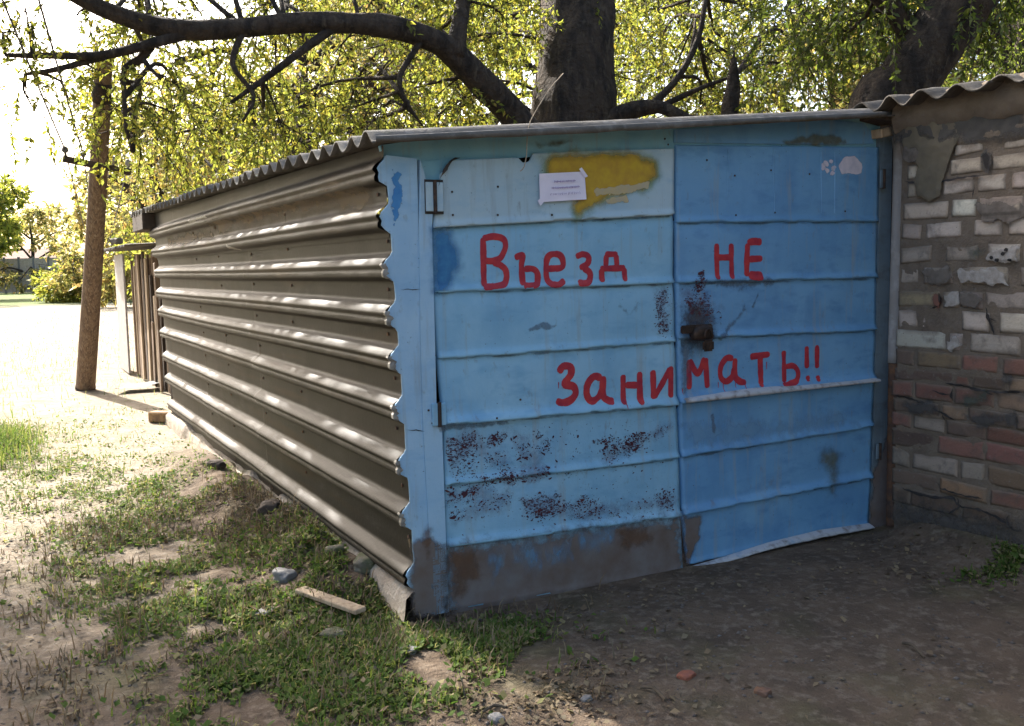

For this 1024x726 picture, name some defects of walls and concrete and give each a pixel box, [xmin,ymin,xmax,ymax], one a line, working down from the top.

spalling [975,201,1024,224]
rust [654,269,722,338]
spalling [944,245,1020,307]
rust [407,424,701,617]